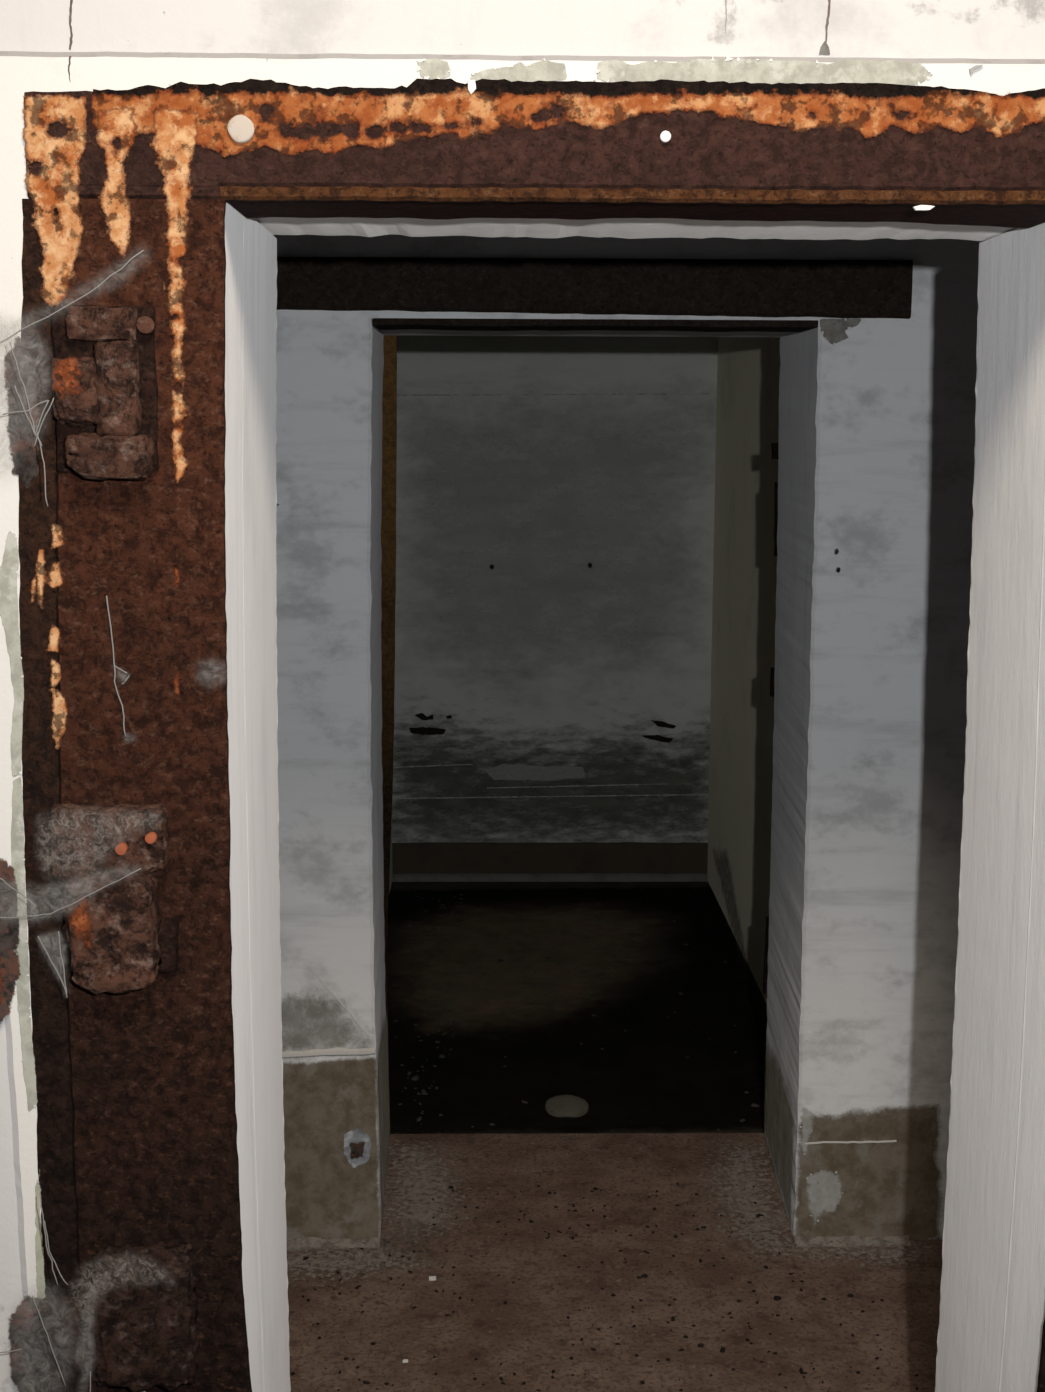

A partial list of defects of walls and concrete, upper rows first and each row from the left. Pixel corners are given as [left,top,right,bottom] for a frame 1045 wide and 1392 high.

rust [22,78,1045,482]
rust [31,524,63,608]
rust [47,625,68,749]
peeling [0,531,38,1111]
water stain [392,722,710,843]
rust [70,898,92,948]